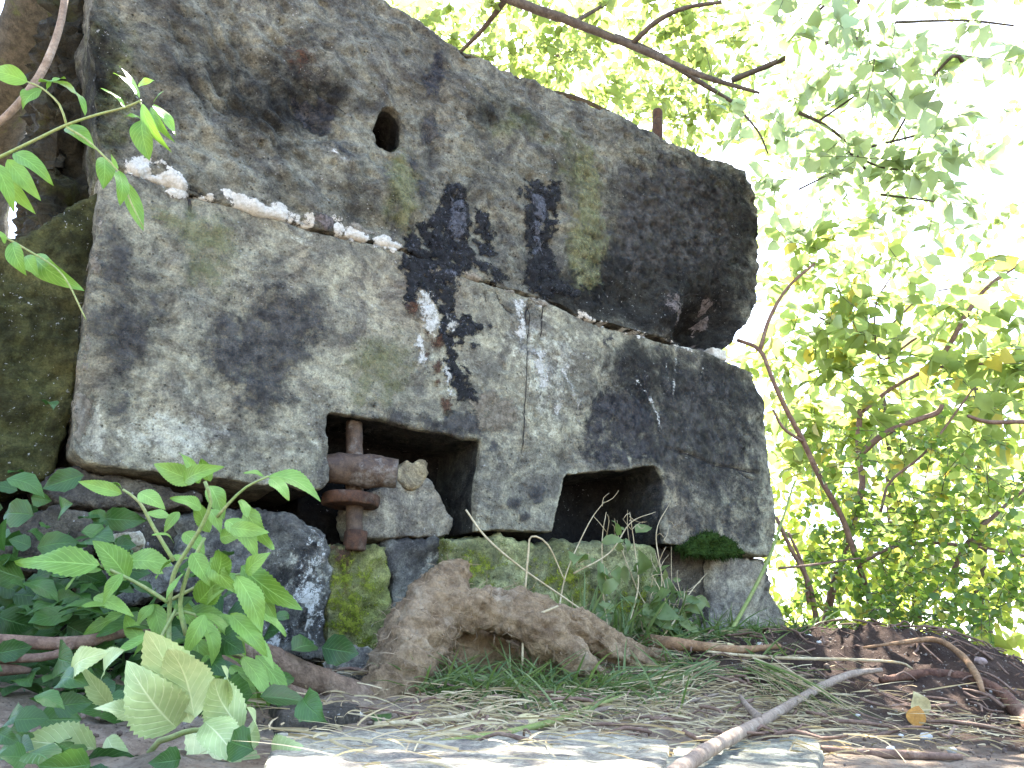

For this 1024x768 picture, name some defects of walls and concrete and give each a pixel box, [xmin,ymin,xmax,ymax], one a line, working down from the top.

water stain [421,112,439,144]
water stain [386,144,609,405]